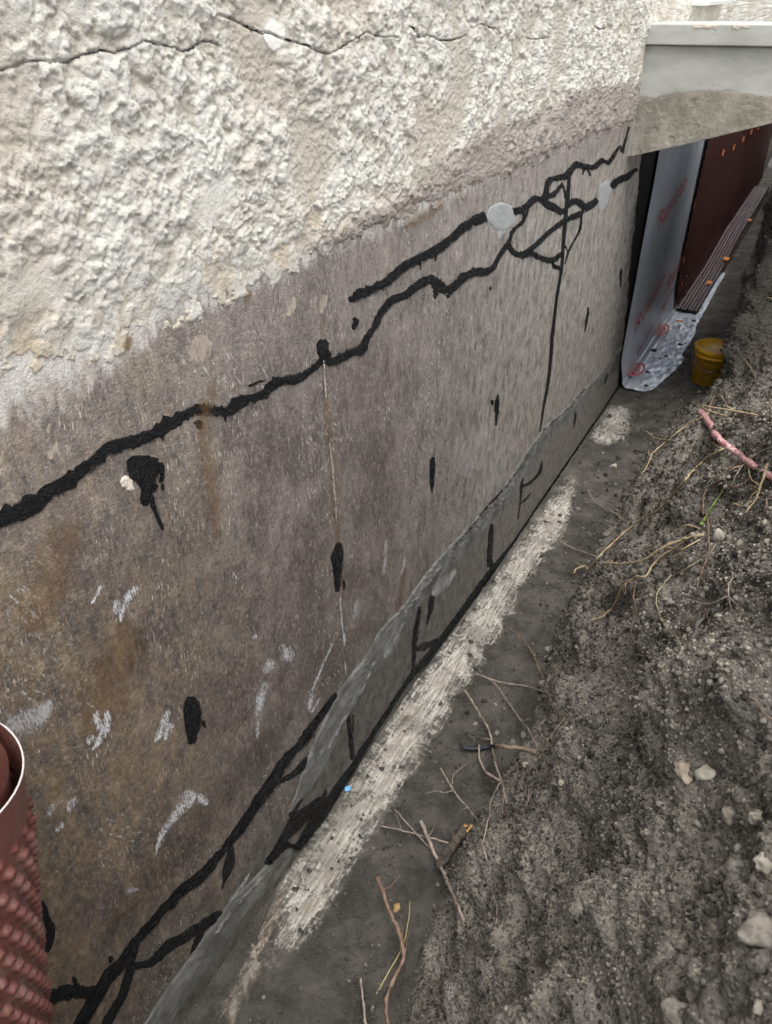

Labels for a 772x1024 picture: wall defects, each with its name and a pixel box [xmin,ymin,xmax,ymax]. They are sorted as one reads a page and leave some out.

crack [0,40,219,71]
crack [217,14,493,54]
crack [0,126,638,528]
crack [486,461,543,568]
crack [49,692,355,1024]